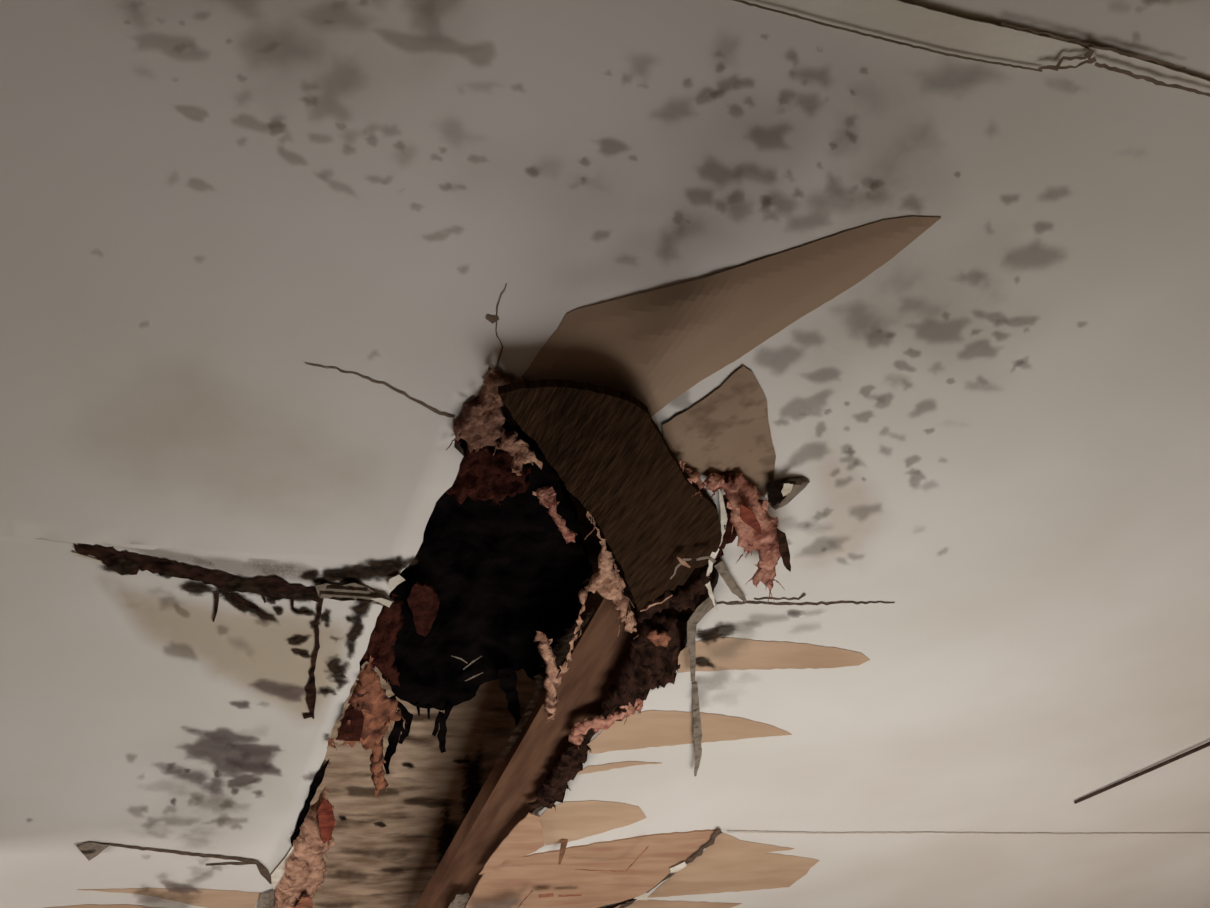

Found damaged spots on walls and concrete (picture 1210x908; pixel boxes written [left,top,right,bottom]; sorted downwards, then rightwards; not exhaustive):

crack [733,0,1210,97]
peeling [521,216,941,417]
water stain [167,730,280,795]